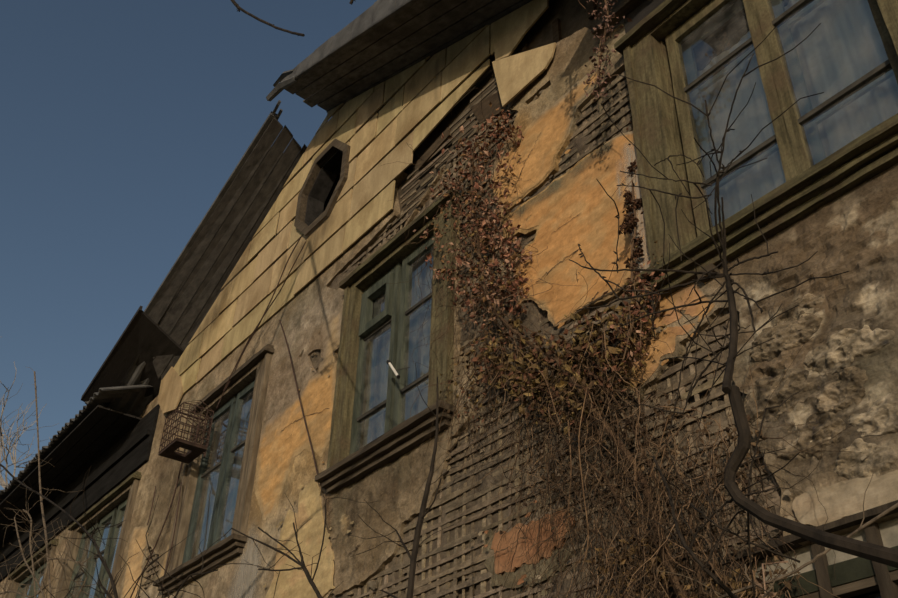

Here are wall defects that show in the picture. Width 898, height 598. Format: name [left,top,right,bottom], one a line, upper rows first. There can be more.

crack [536,247,637,323]
spalling [255,64,783,598]
peeling [735,436,898,527]